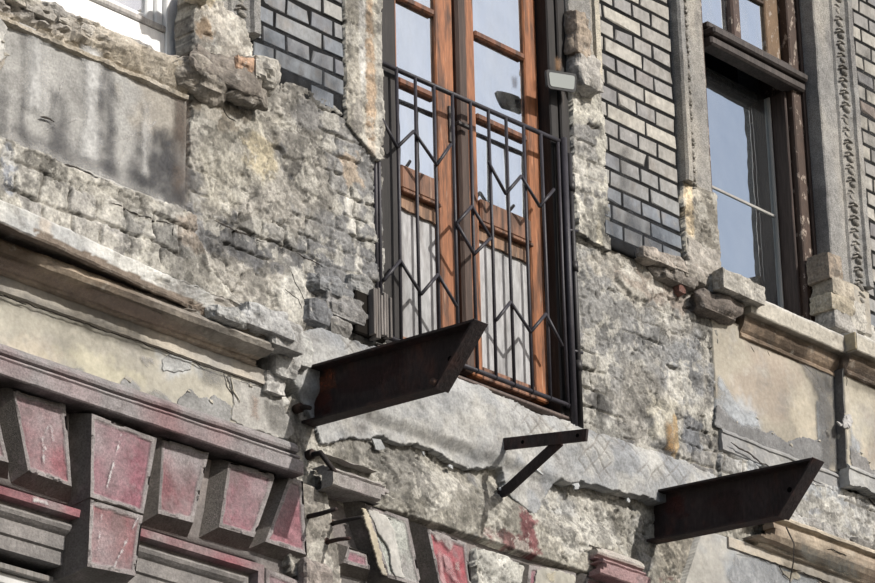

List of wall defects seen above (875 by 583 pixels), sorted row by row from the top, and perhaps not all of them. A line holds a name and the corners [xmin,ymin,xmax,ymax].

water stain [29,36,122,180]
water stain [127,101,186,204]
spalling [564,10,829,477]
spalling [0,0,694,583]
spalling [806,252,875,341]
flaking render [836,414,875,475]
spalling [715,524,765,543]
flaking render [730,556,821,583]
spalling [790,482,875,550]